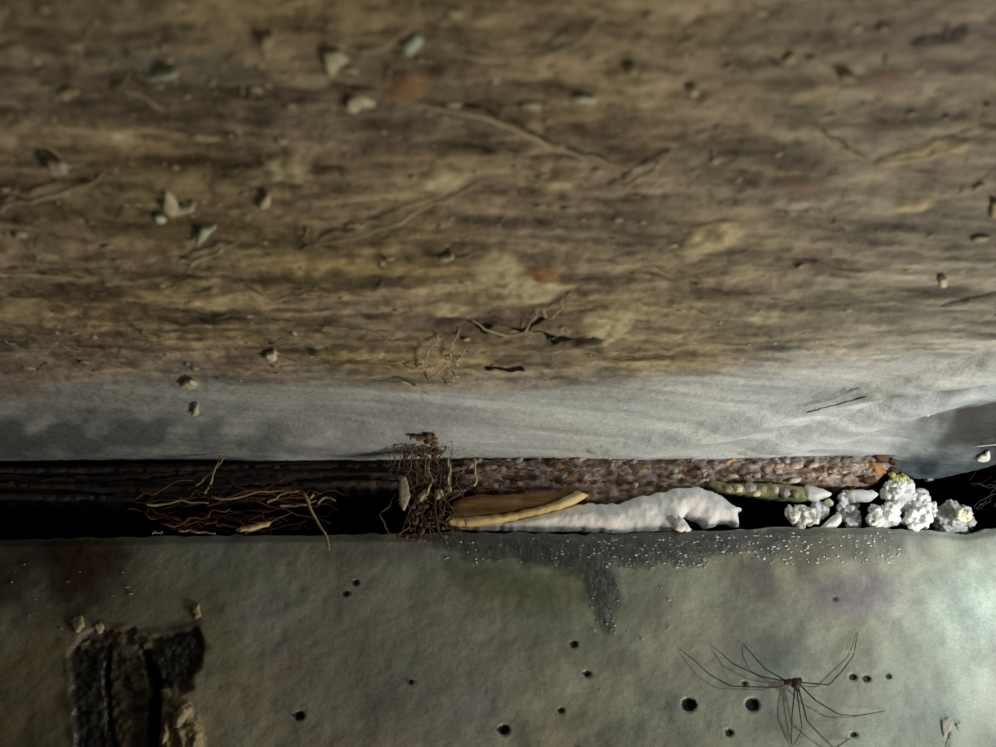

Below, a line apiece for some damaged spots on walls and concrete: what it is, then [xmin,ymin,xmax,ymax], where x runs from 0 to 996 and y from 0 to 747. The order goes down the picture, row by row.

leakage [439,529,900,631]
crack [103,647,117,747]
spalling [66,603,207,747]
crack [142,645,163,747]
crack [941,717,961,747]